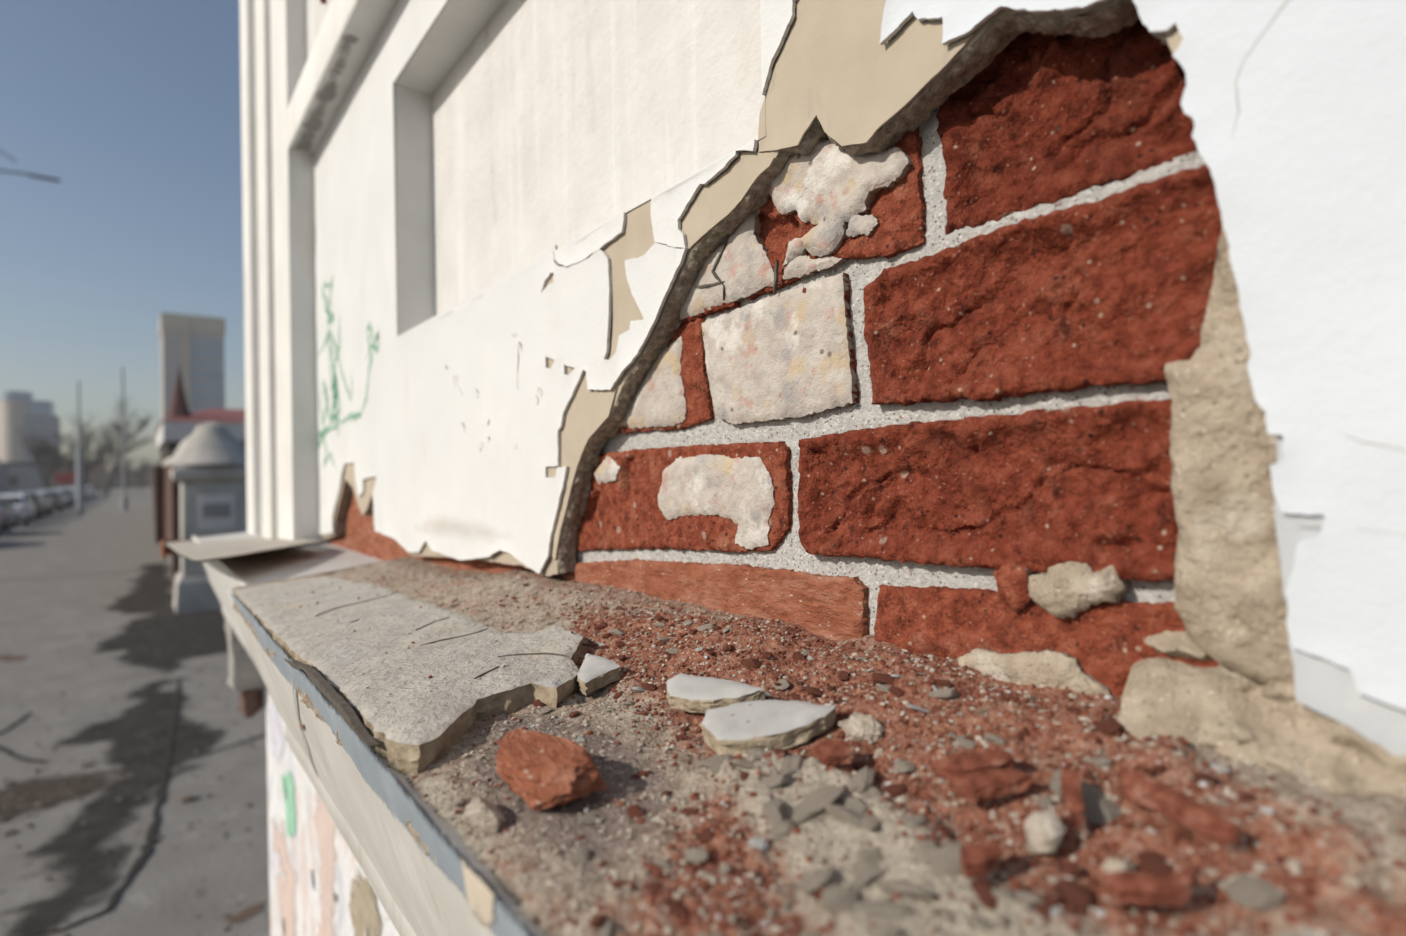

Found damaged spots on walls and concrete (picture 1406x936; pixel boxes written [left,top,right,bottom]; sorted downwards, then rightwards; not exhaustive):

crack [1231,0,1289,138]
spalling [329,463,534,574]
spalling [548,0,1406,800]
peeling [230,592,527,936]